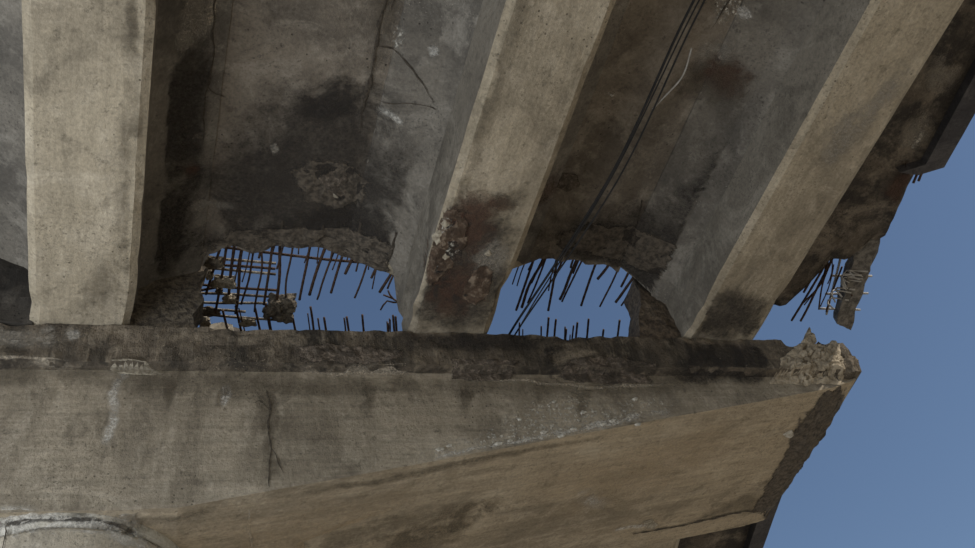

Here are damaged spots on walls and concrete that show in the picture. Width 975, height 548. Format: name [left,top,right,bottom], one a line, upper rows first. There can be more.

crack [360,0,436,130]
spalling [289,160,369,210]
spalling [199,219,398,332]
spalling [417,197,677,340]
crack [254,390,284,485]
spalling [752,259,872,518]
damp [0,513,145,548]